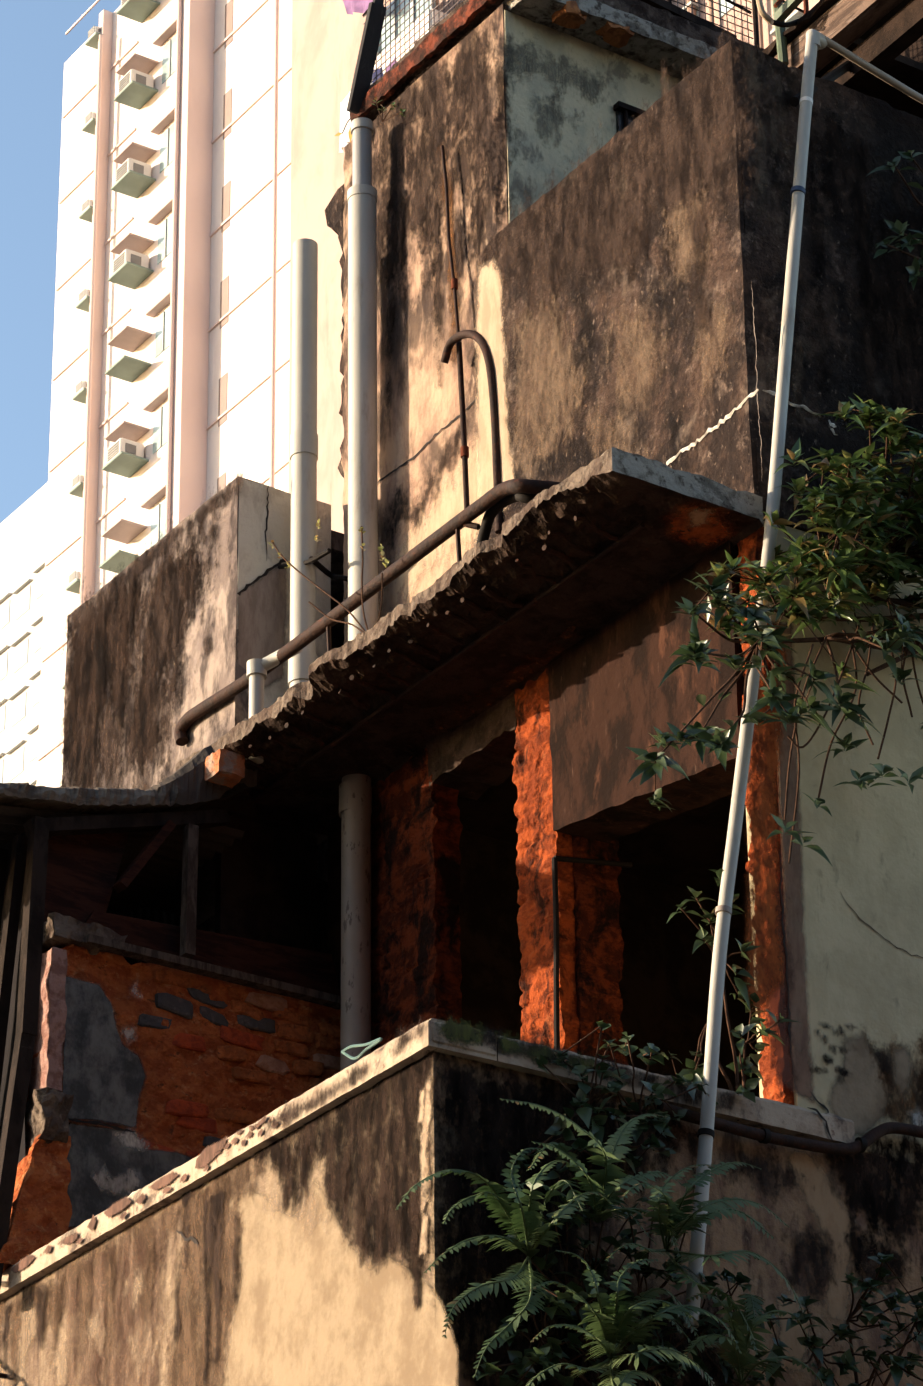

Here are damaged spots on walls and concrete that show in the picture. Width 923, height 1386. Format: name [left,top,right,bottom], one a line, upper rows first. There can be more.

leakage [372,22,775,357]
leakage [805,109,923,449]
leakage [54,473,243,790]
crack [236,480,287,687]
peeling [746,622,923,1135]
crack [842,896,923,958]
spalling [0,1116,280,1273]
leakage [0,1023,741,1386]
leakage [732,1145,803,1197]
leakage [781,1135,923,1299]